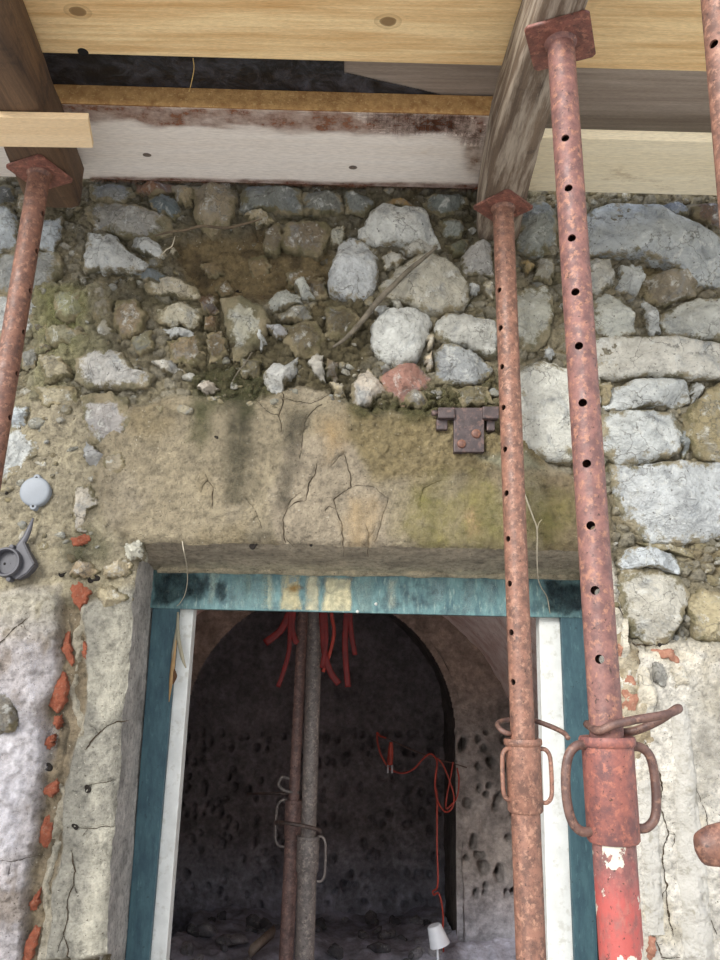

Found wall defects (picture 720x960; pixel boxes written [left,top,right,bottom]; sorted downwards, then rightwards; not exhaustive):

crack [246,392,388,555]
flaking render [22,575,100,960]
crack [58,826,114,958]
crack [656,772,680,959]